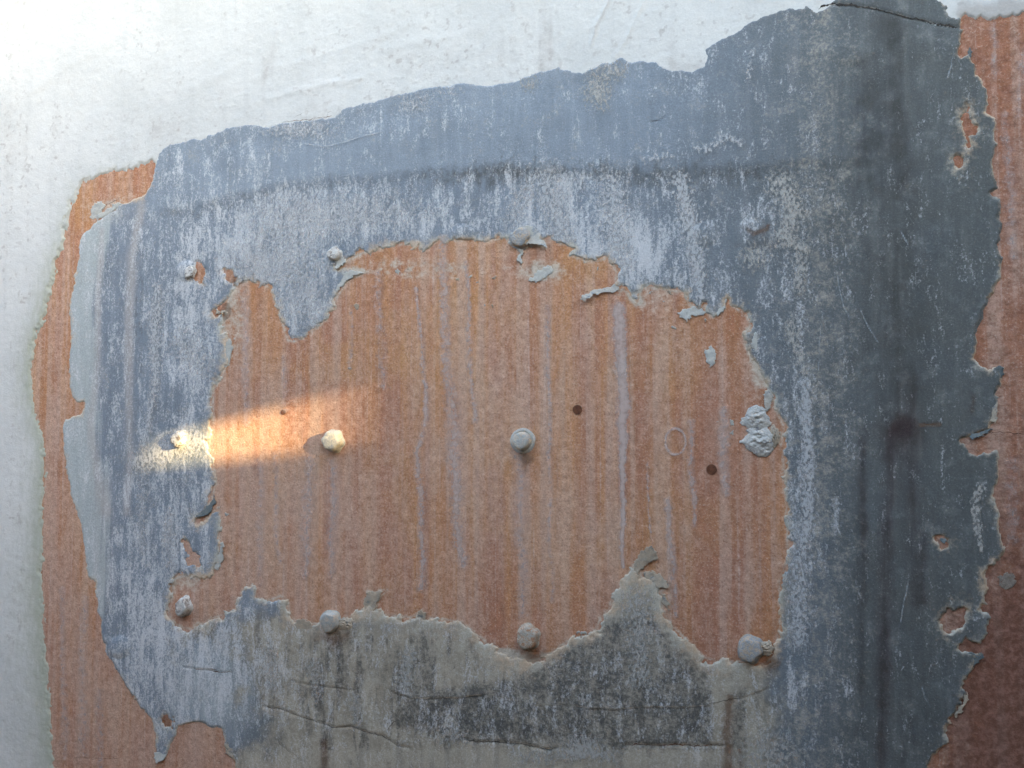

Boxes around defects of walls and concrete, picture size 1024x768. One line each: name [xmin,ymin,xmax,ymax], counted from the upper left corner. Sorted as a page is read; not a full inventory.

crack [819,3,957,28]
peeling [167,225,793,666]